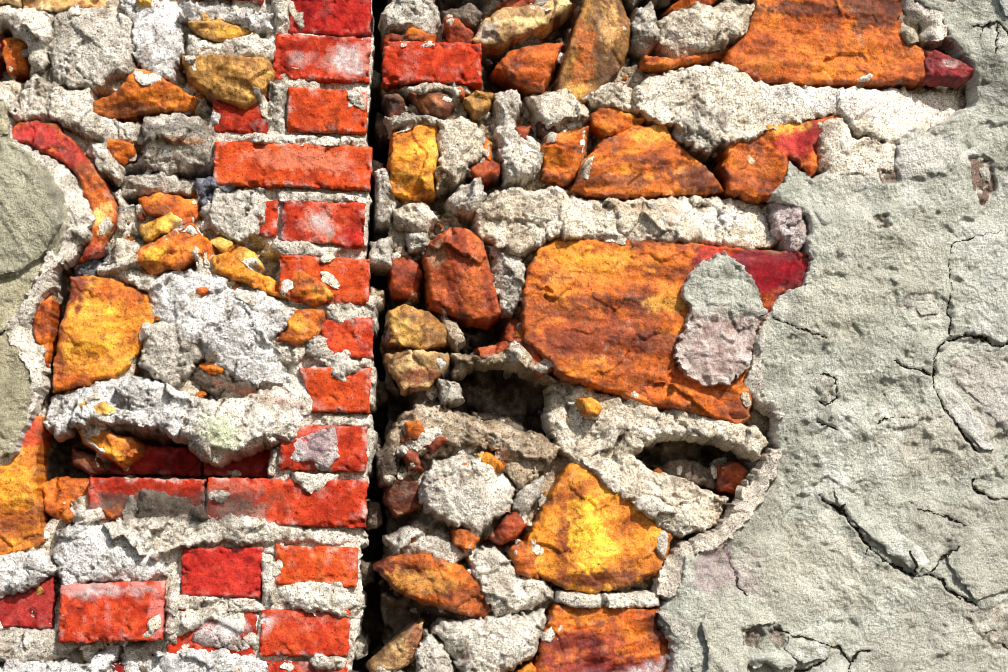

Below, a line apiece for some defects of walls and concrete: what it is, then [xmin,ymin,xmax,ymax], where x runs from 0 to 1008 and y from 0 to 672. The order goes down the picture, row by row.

spalling [898,0,956,49]
peeling [0,83,96,466]
peeling [673,250,785,424]
crack [757,314,827,339]
spalling [899,293,952,320]
crack [894,230,1008,452]
crack [808,372,838,430]
peeling [651,447,845,672]
peeling [834,488,930,572]
crack [818,494,977,606]
crack [971,478,1008,500]
crack [773,626,871,672]